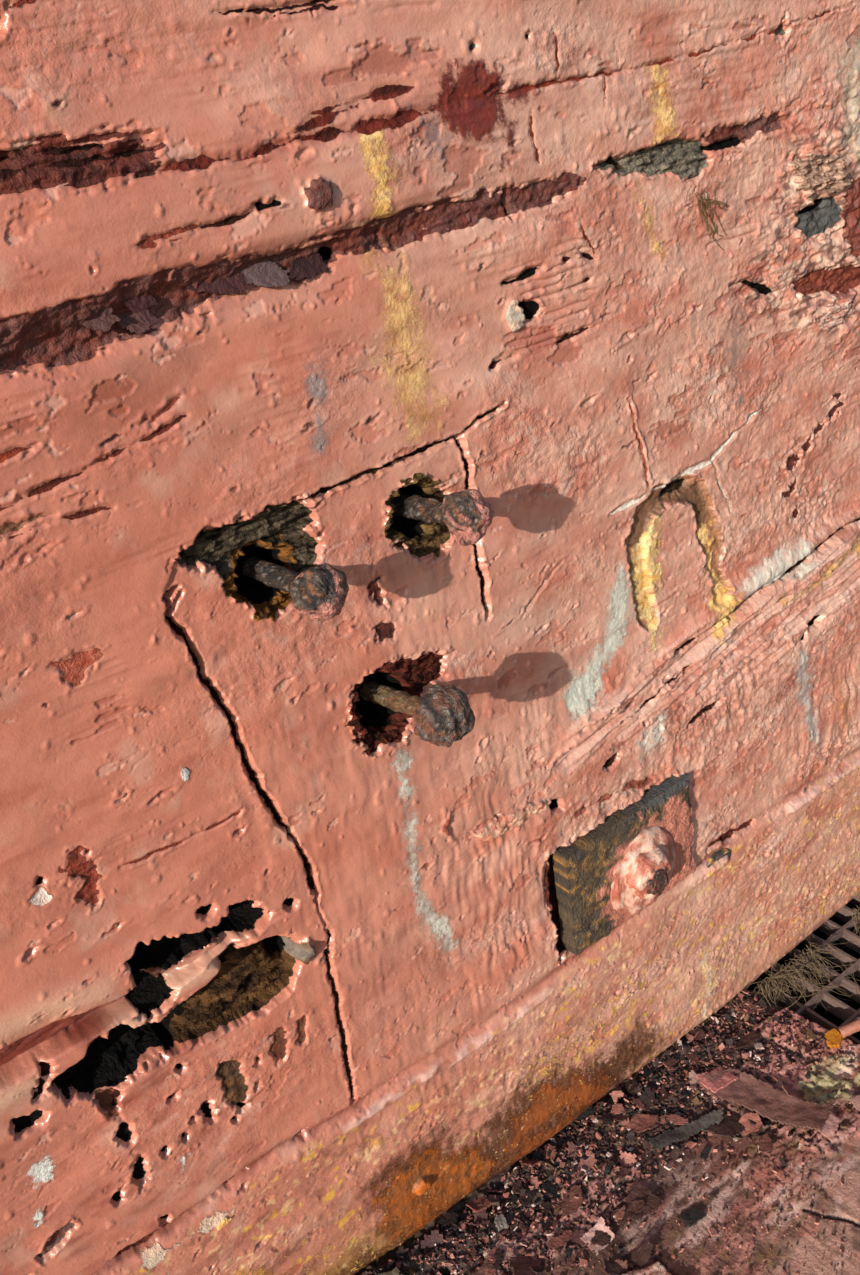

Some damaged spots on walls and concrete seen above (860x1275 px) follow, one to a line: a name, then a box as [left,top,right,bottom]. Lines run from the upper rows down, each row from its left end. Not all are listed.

peeling [0,113,782,375]
peeling [792,178,860,295]
crack [299,406,498,500]
crack [473,544,486,611]
crack [125,590,315,889]
spalling [262,935,286,955]
peeling [95,1088,120,1117]
spalling [126,970,174,1019]
peeling [217,1060,248,1105]
peeling [269,1016,306,1061]
crack [324,922,353,1100]
corrosion [341,1022,662,1275]